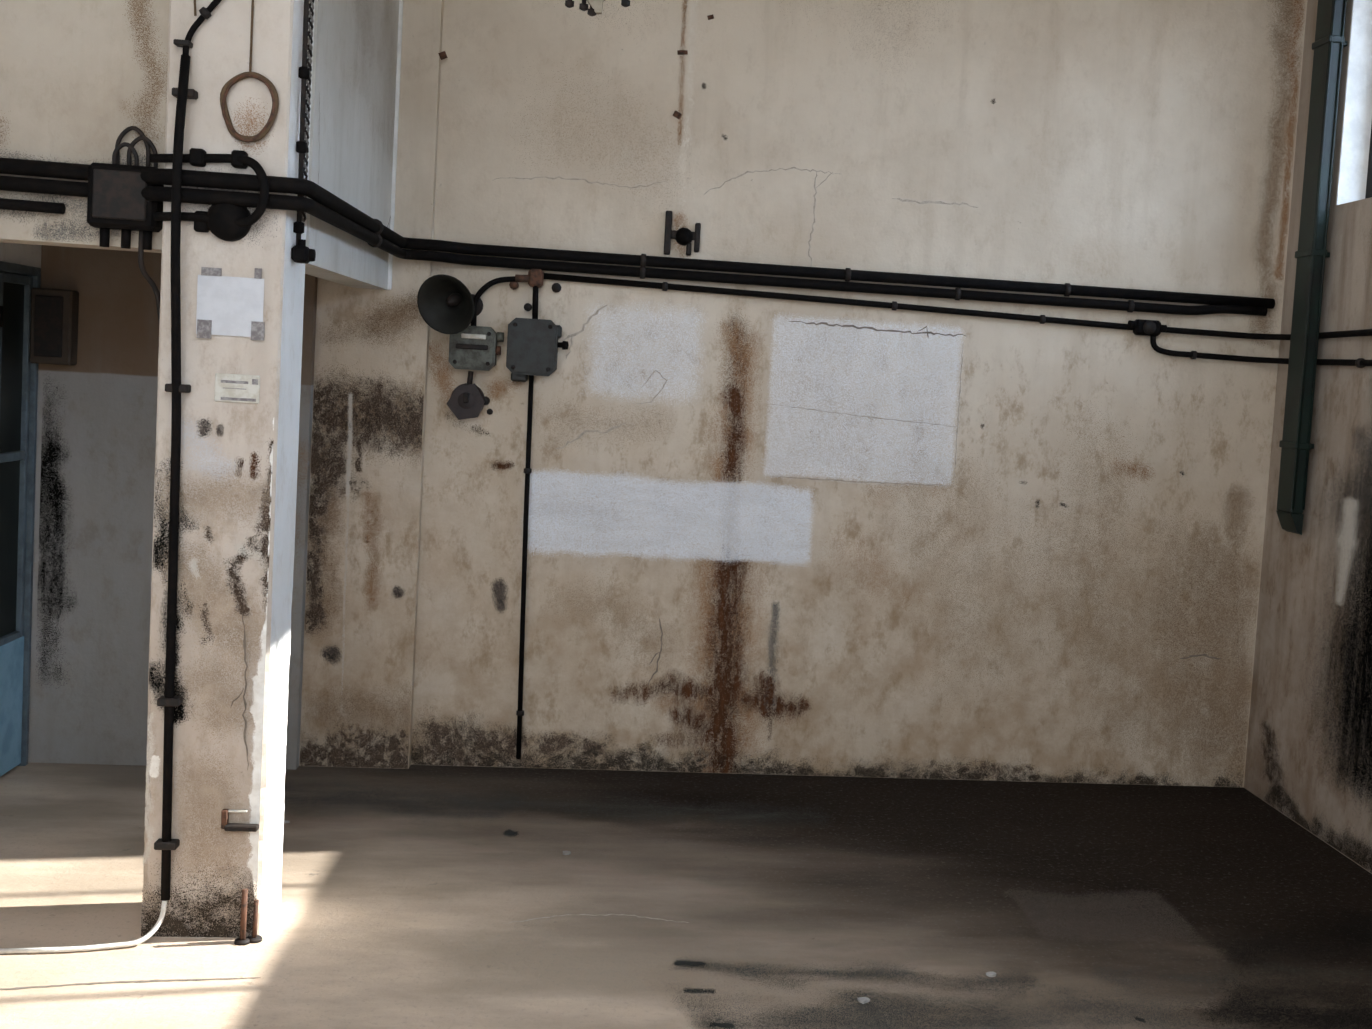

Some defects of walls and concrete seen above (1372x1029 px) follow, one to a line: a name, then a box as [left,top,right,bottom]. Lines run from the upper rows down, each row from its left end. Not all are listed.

crack [705,167,839,267]
water stain [254,439,274,613]
water stain [292,289,425,642]
corrosion [700,308,765,496]
crack [789,321,966,338]
corrosion [611,534,814,774]
water stain [300,398,1372,873]